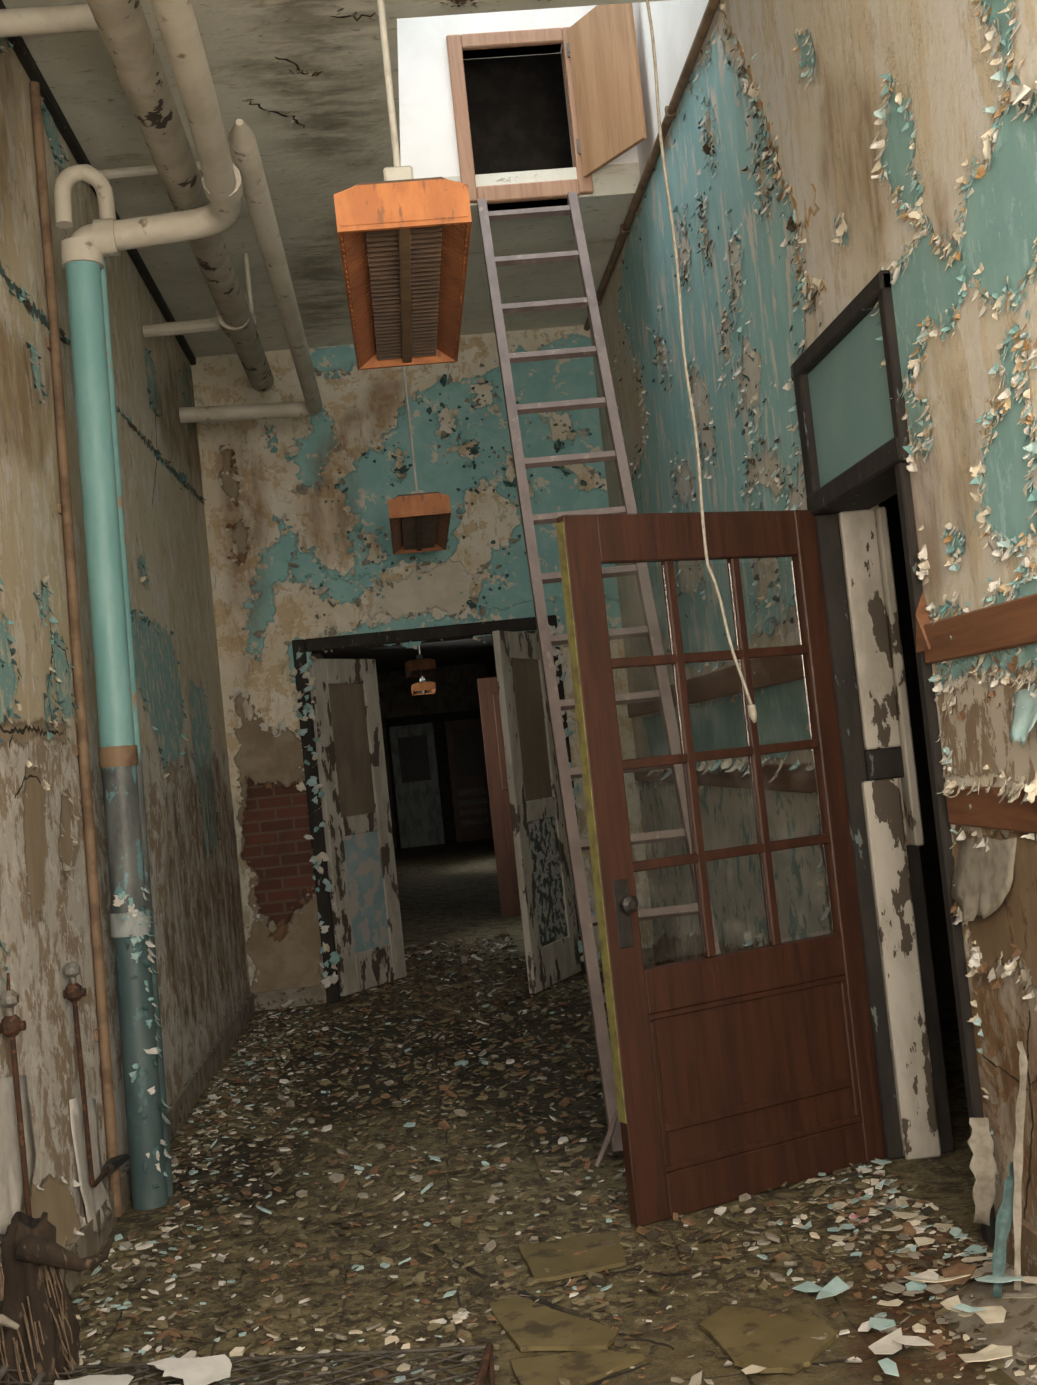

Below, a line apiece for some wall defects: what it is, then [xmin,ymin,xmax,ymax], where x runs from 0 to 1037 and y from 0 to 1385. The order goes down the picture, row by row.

peeling [0,260,71,345]
peeling [831,213,849,254]
peeling [870,0,1037,625]
peeling [116,406,206,506]
peeling [131,3,831,1008]
flaking render [928,643,1037,804]
flaking render [949,824,1037,1055]
peeling [113,887,179,1188]
flaking render [0,1075,112,1248]
crack [432,1244,730,1385]
crack [811,1356,873,1367]
peeling [791,1159,1037,1377]